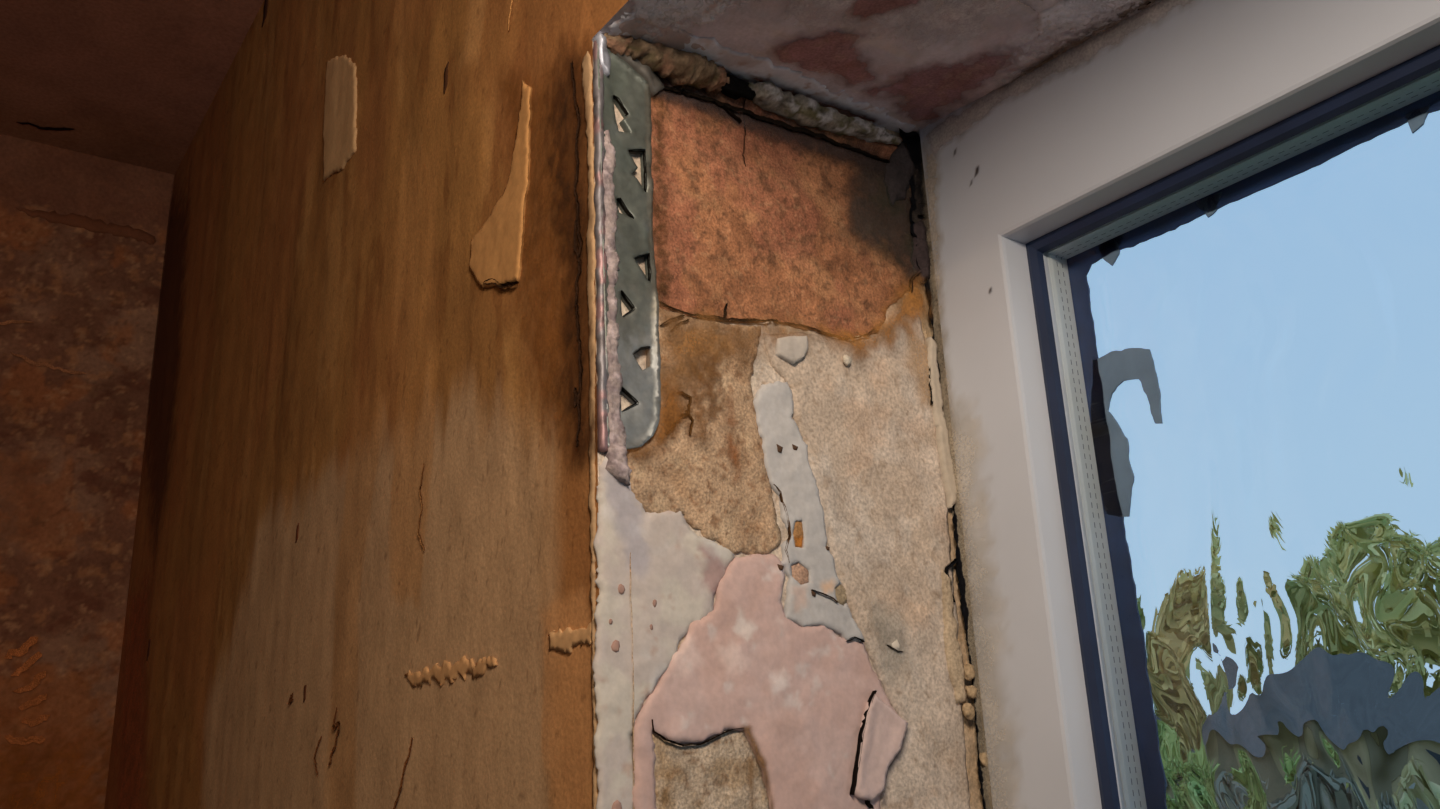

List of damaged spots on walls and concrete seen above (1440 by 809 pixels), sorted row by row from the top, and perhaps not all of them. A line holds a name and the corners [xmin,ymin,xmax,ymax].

peeling [323,55,357,182]
peeling [469,80,533,289]
flaking render [603,33,918,365]
damp [655,74,927,282]
peeling [775,0,1019,122]
peeling [925,337,958,509]
peeling [609,619,620,652]
peeling [941,569,967,704]
flaking render [652,730,769,809]
peeling [854,694,908,802]